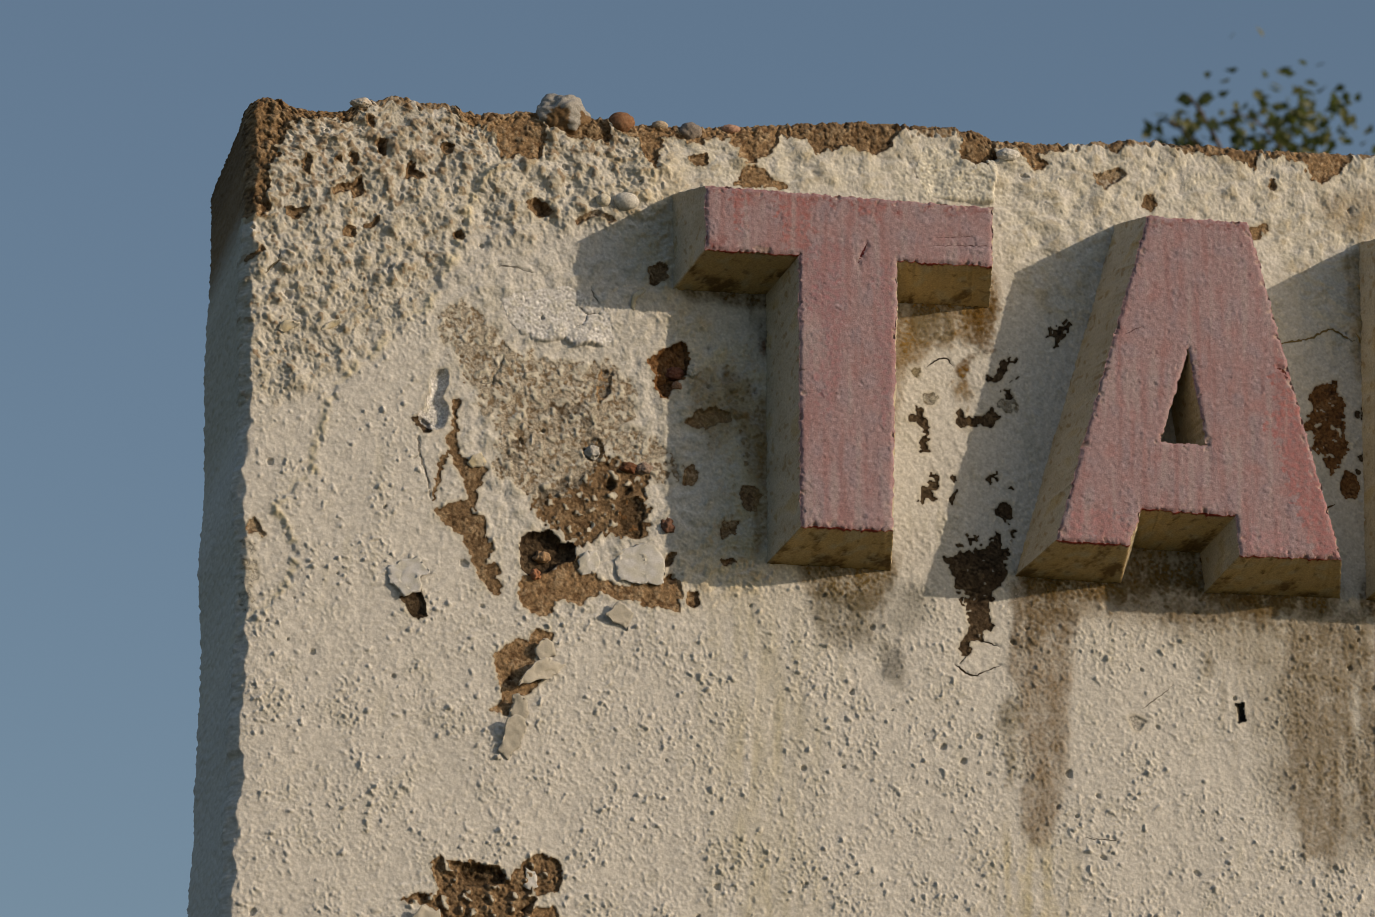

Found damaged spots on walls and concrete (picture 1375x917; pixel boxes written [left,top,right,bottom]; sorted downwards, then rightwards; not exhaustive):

spalling [459,109,1067,190]
spalling [1093,140,1128,190]
spalling [1167,143,1353,191]
peeling [909,392,939,453]
peeling [956,357,1019,428]
peeling [1303,380,1363,499]
peeling [411,286,700,760]
peeling [917,472,958,505]
peeling [387,555,430,620]
peeling [942,471,1017,656]
water stain [1003,581,1073,840]
spalling [401,853,563,917]